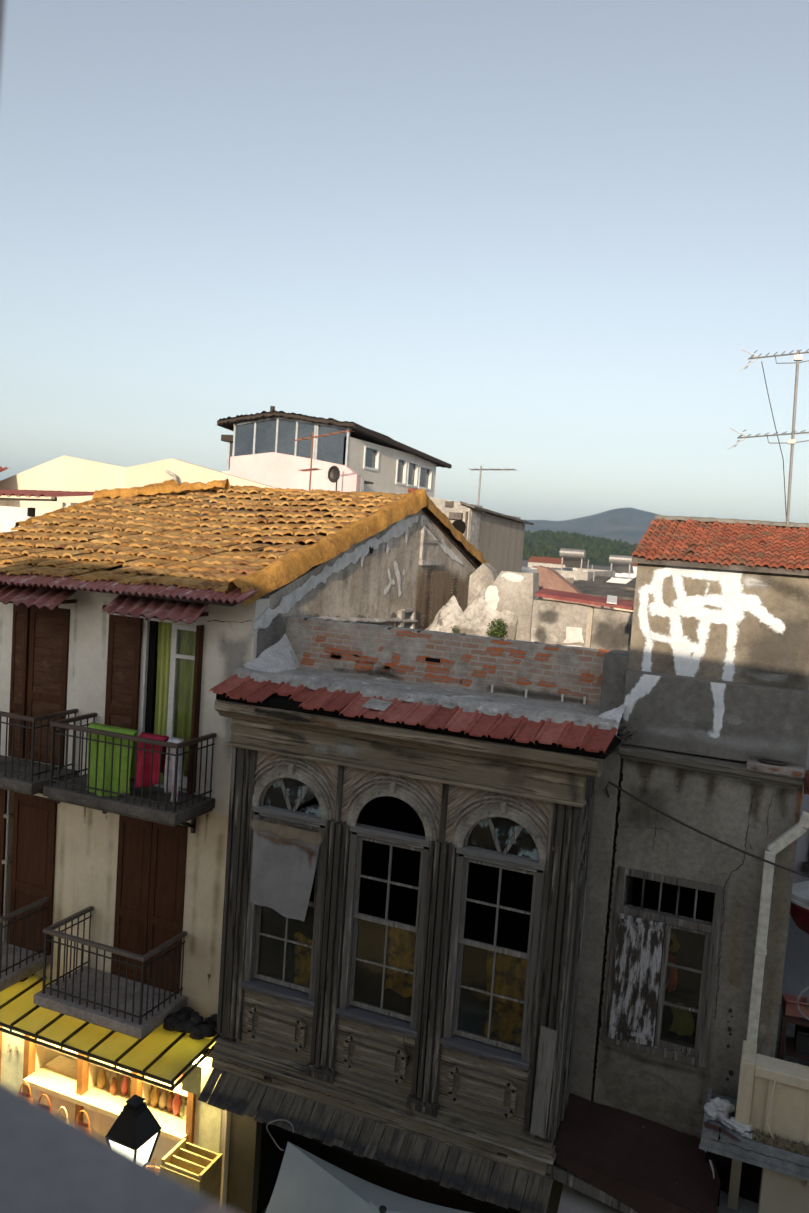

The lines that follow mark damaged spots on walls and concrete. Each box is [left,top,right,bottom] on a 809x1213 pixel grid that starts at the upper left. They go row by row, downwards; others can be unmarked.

leakage [766,578,809,601]
flaking render [357,613,432,639]
flaking render [301,627,602,694]
leakage [747,621,809,684]
crack [714,786,772,1020]